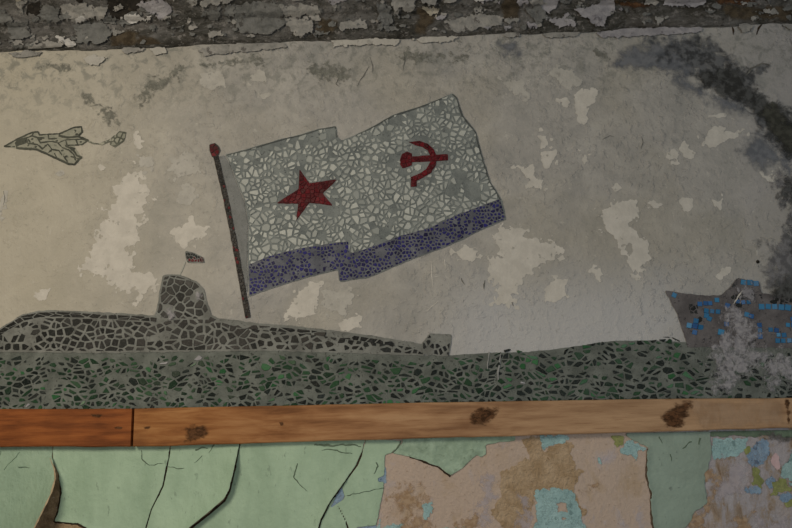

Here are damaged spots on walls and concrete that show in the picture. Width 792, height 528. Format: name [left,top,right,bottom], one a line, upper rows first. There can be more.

peeling [0,0,722,58]
peeling [734,0,792,33]
peeling [547,64,598,125]
peeling [511,128,558,191]
peeling [666,113,750,165]
peeling [449,222,565,310]
peeling [594,183,663,281]
crack [53,475,86,528]
crack [141,444,215,528]
crack [191,444,240,528]
peeling [53,436,515,528]
peeling [626,430,792,528]